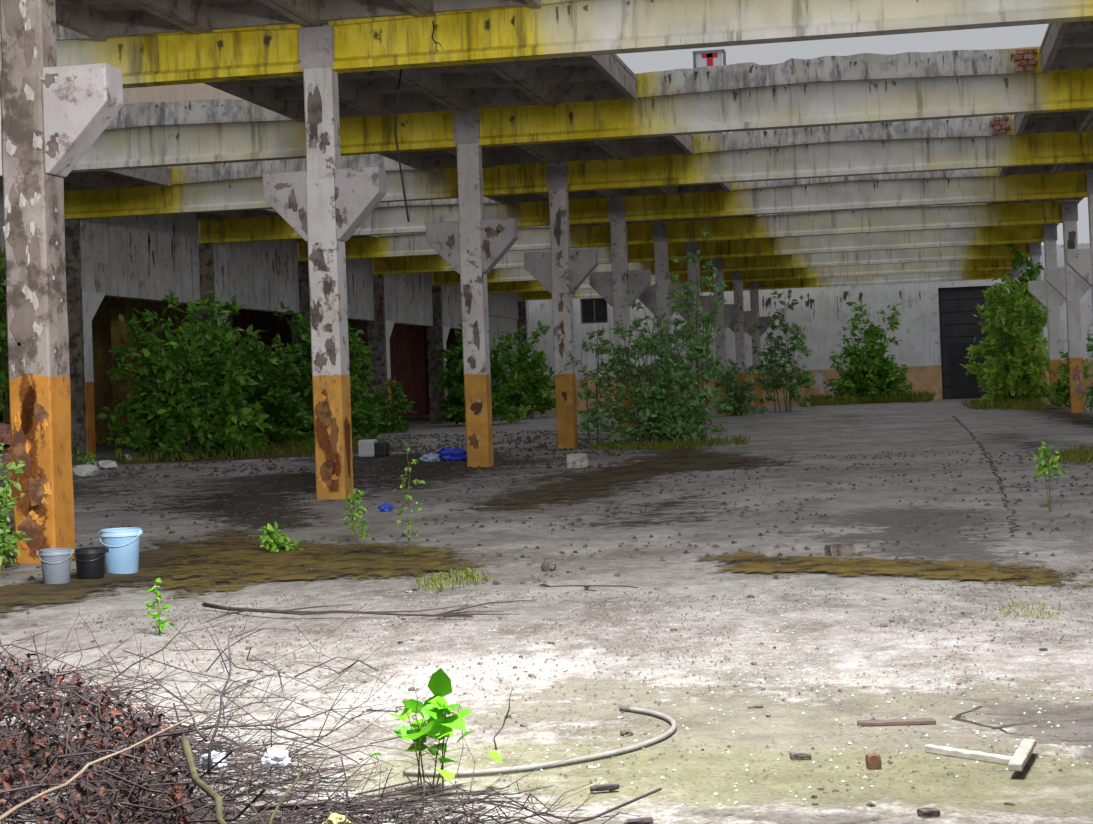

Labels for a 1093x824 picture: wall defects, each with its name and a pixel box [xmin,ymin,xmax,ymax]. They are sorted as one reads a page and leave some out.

peeling [305,83,330,155]
peeling [2,0,64,374]
peeling [273,183,340,372]
peeling [323,172,343,230]
peeling [446,234,455,250]
peeling [482,224,506,259]
peeling [463,284,481,369]
corrosion [4,372,48,559]
corrosion [314,389,351,493]
peeling [470,398,483,416]
crack [928,416,1052,531]